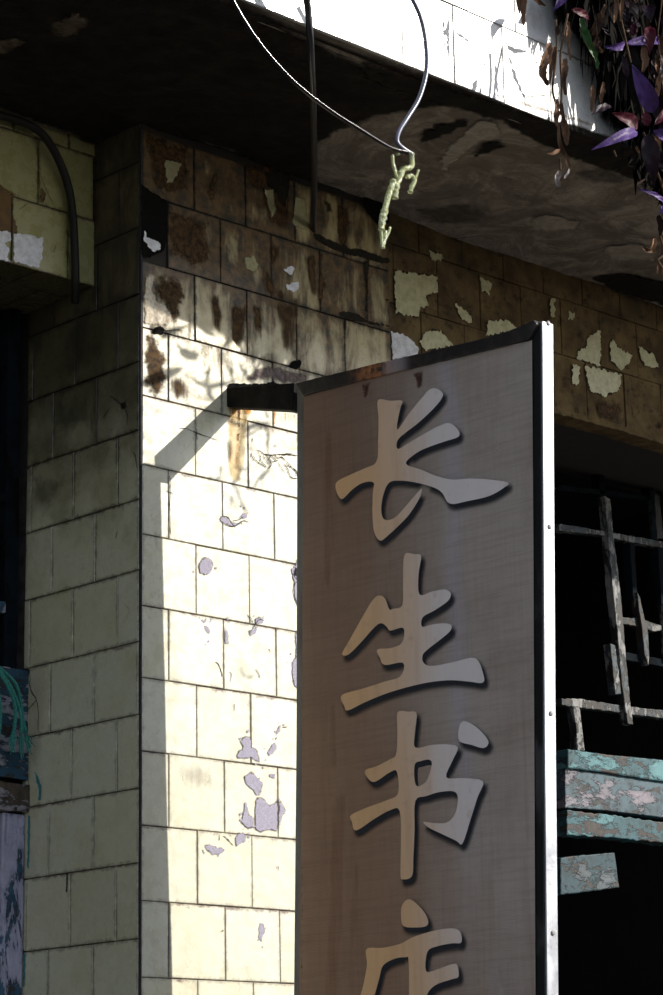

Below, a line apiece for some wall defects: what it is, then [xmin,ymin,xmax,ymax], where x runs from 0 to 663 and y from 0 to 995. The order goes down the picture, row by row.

flaking render [0,185,44,268]
peeling [394,269,439,319]
peeling [479,277,492,295]
peeling [455,303,472,323]
peeling [486,319,526,336]
flaking render [391,329,453,360]
peeling [571,330,658,398]
spalling [220,505,247,527]
spalling [193,557,217,575]
spalling [235,722,286,846]
spalling [203,845,224,857]